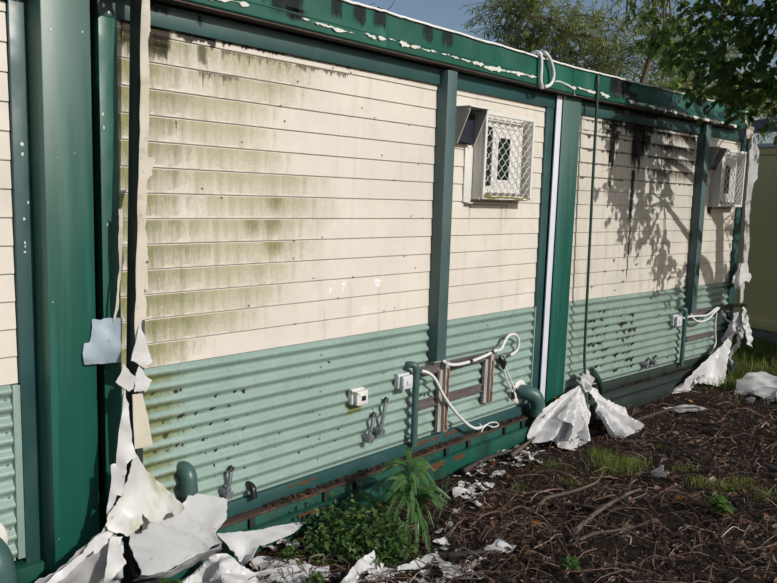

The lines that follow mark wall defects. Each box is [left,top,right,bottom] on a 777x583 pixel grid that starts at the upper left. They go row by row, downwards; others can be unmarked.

leakage [150,3,169,14]
leakage [148,27,409,81]
leakage [263,0,304,20]
leakage [331,0,342,17]
leakage [353,5,386,30]
leakage [423,25,453,47]
peeling [365,33,535,78]
leakage [117,21,130,236]
leakage [580,77,697,283]
leakage [146,220,180,235]
leakage [147,244,188,285]
leakage [145,293,190,357]